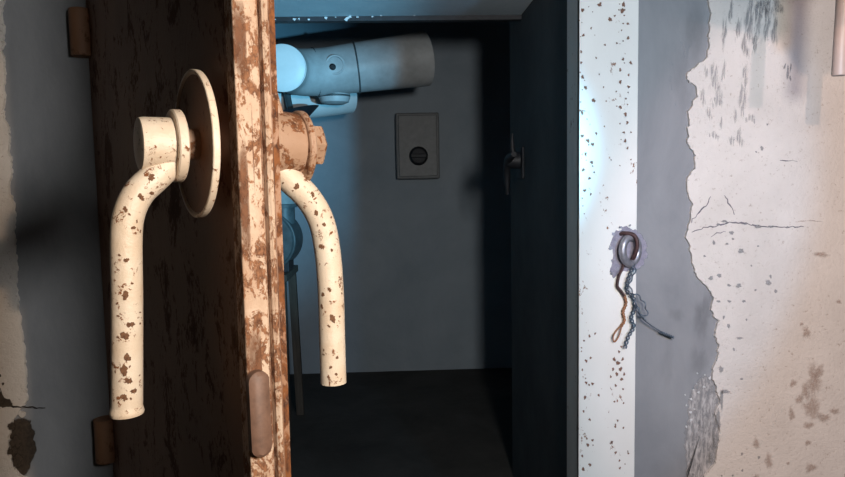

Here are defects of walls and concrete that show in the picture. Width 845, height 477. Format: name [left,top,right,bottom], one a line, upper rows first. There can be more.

crack [691,195,804,237]
spalling [0,374,37,475]
peeling [684,372,728,477]